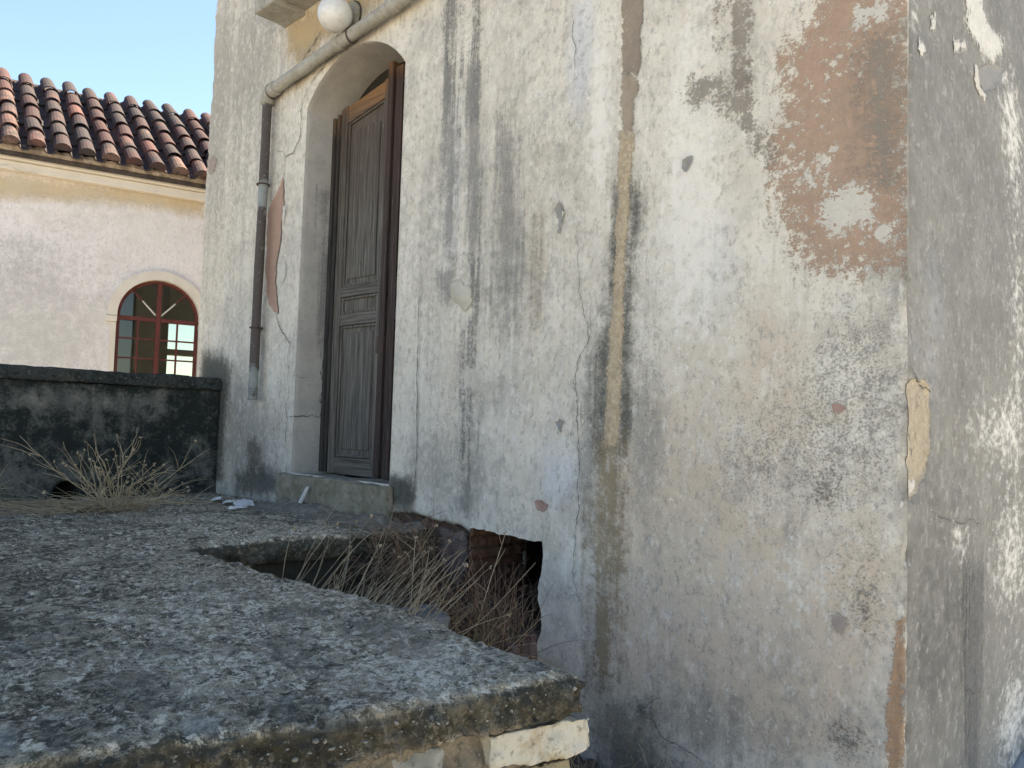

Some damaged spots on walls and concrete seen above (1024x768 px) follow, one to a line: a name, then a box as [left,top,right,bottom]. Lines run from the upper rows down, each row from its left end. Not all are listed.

peeling [265,178,287,314]
damp [443,0,491,368]
peeling [680,0,936,287]
peeling [953,0,1005,102]
flaking render [392,511,469,604]
crack [563,241,591,615]
damp [583,129,668,768]
flaking render [906,378,930,500]